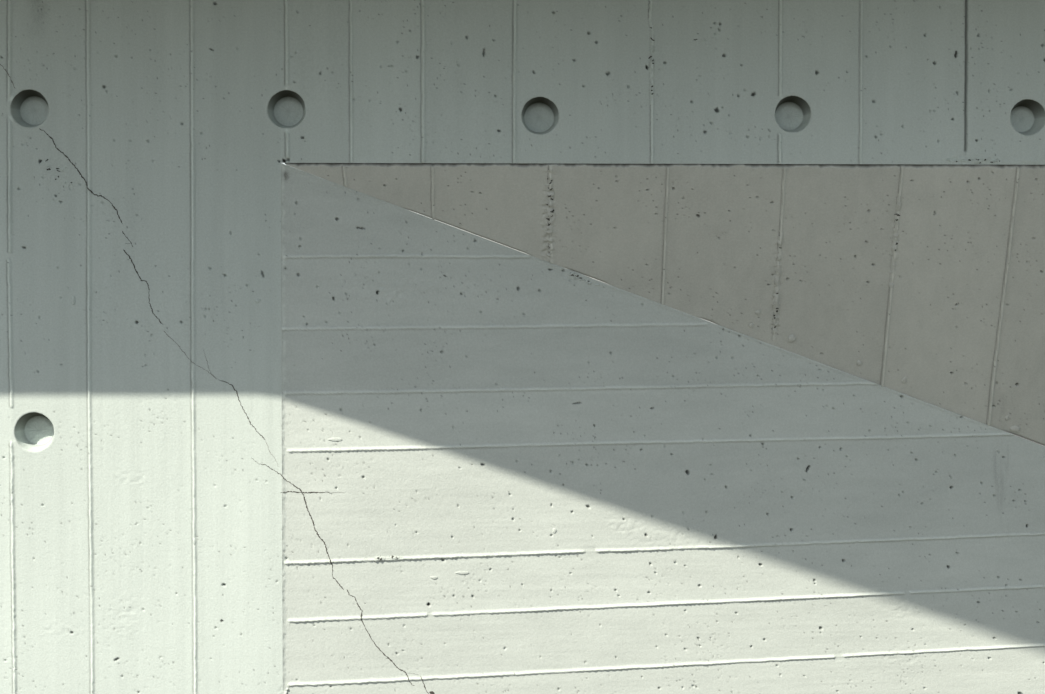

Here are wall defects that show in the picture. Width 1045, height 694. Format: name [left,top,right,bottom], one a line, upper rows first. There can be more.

crack [39,128,435,694]